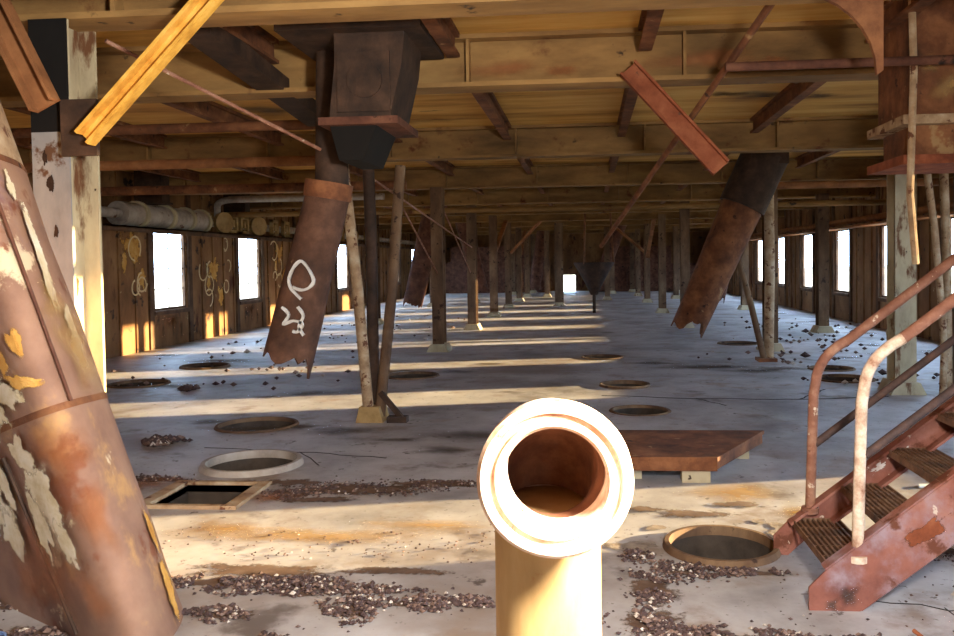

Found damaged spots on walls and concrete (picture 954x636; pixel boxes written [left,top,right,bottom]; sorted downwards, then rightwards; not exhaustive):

peeling [4,168,91,370]
peeling [42,150,54,192]
peeling [0,329,80,571]